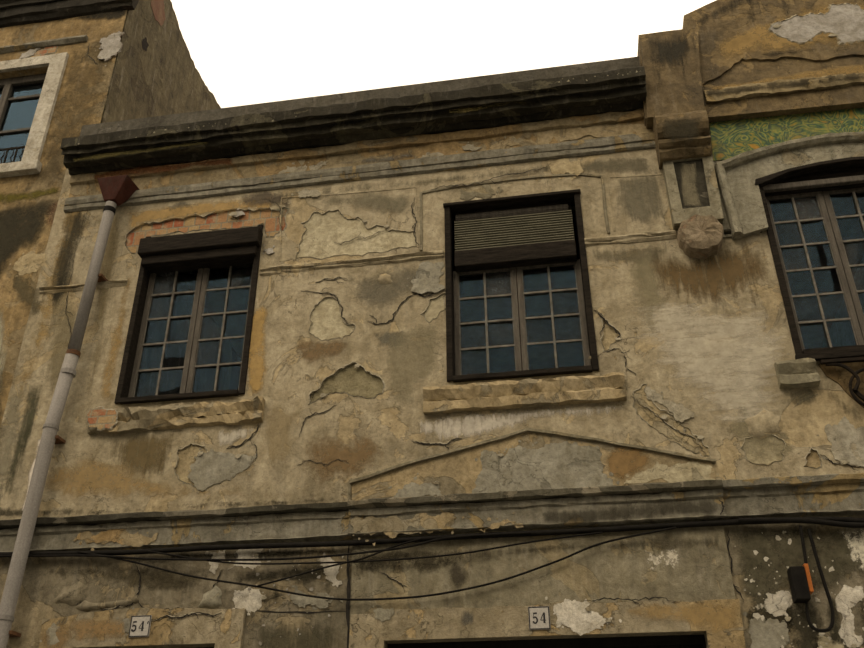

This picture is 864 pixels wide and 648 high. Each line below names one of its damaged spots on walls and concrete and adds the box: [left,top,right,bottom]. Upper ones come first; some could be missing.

peeling [98,31,125,66]
peeling [768,3,864,46]
peeling [291,187,323,198]
damp [0,203,51,272]
peeling [124,206,289,255]
damp [13,211,86,385]
crack [303,277,443,326]
crack [594,310,636,375]
damp [597,249,792,457]
peeling [308,361,385,404]
crack [635,399,707,456]
peeling [174,443,209,487]